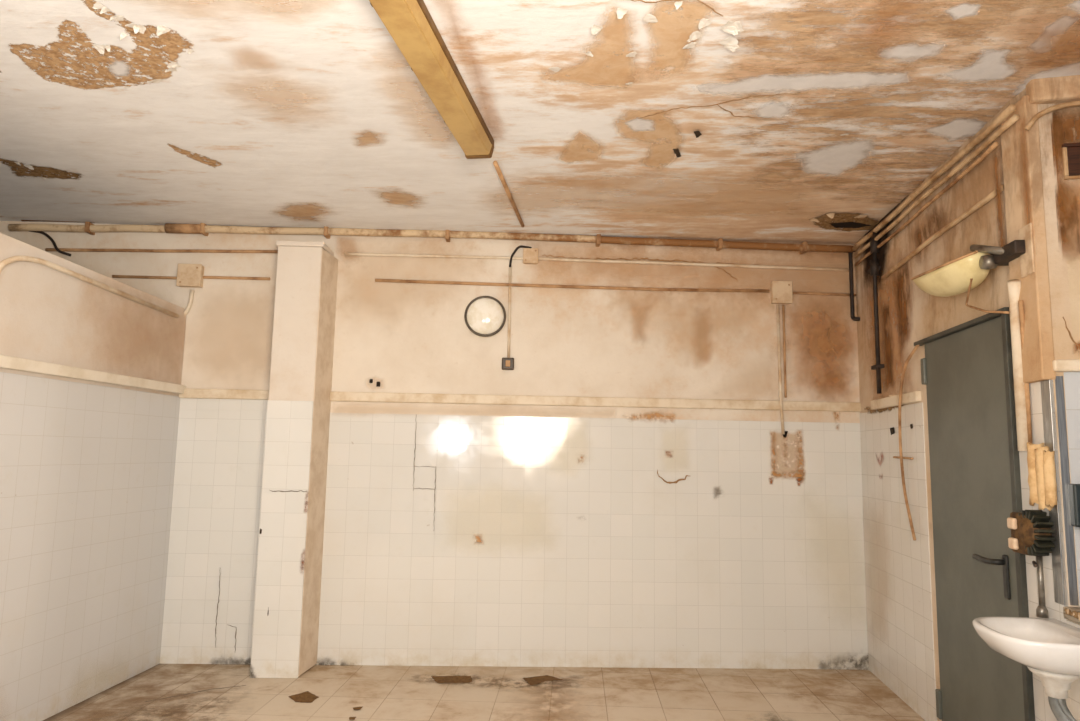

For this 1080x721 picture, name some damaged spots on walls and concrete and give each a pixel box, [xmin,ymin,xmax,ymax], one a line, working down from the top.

peeling [9,0,194,89]
peeling [547,8,637,87]
peeling [0,158,81,179]
peeling [560,133,601,162]
peeling [617,110,681,168]
peeling [643,0,1080,204]
water stain [1051,112,1080,249]
water stain [798,310,848,384]
water stain [870,267,909,389]